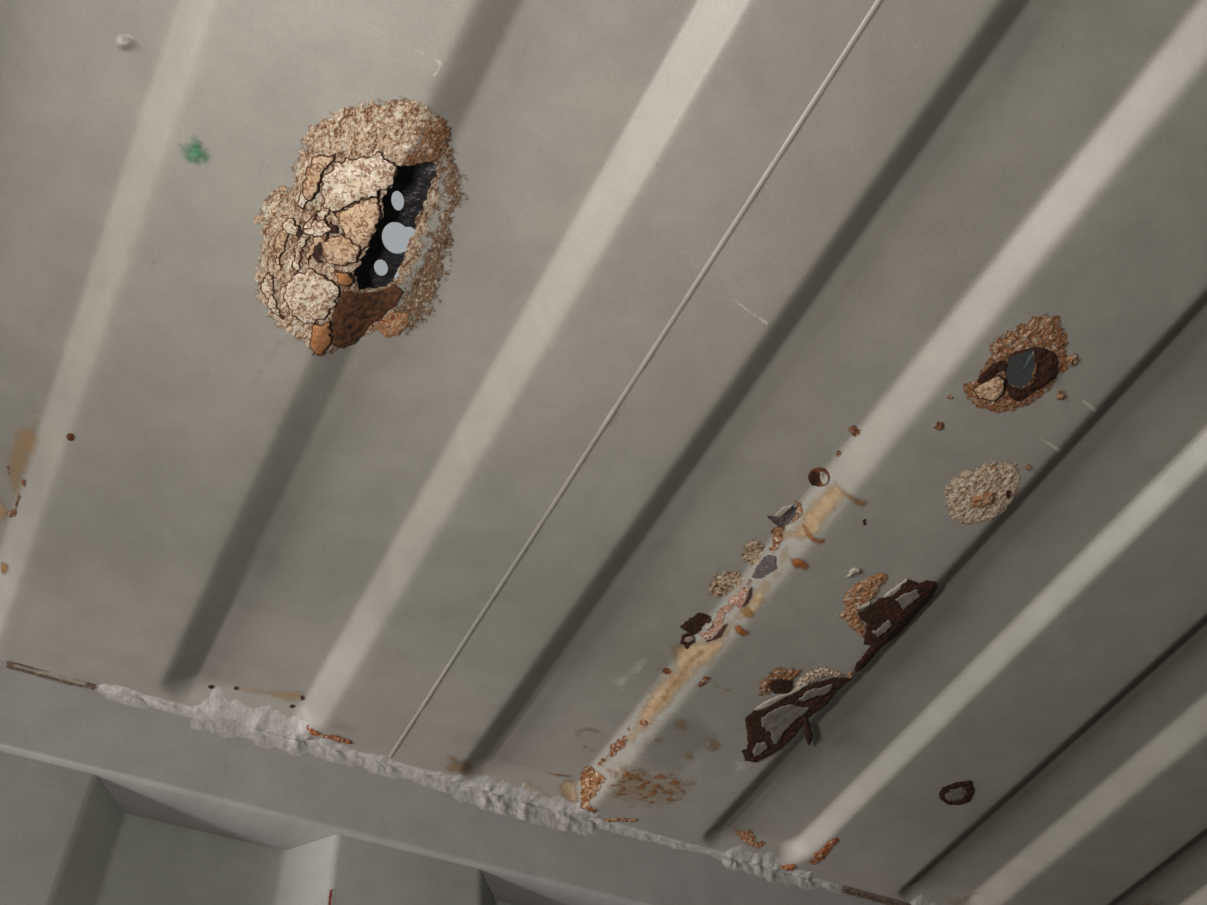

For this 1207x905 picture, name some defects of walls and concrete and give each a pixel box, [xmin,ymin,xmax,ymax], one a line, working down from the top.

peeling [259,151,397,355]
peeling [971,375,1005,401]
rust [706,539,765,598]
peeling [680,500,803,649]
peeling [857,578,908,610]
rust [557,575,776,823]
peeling [754,667,845,711]
rust [742,572,938,763]
rust [306,725,351,744]
spalling [939,780,974,805]
rust [780,838,839,871]
rust [842,886,912,905]